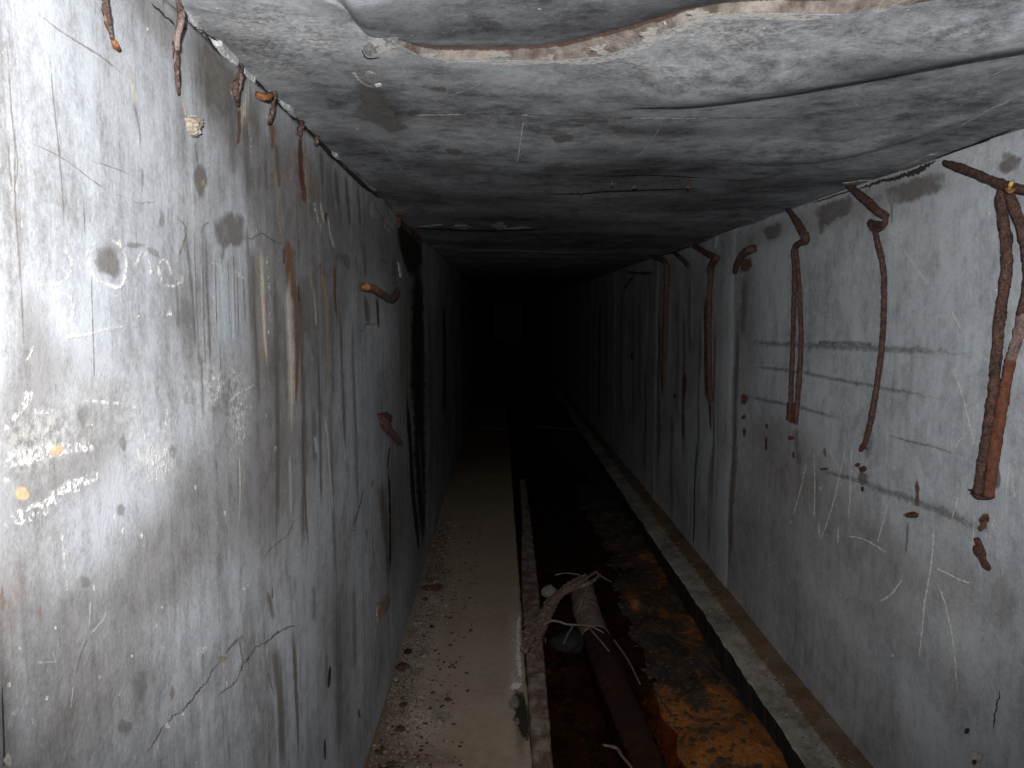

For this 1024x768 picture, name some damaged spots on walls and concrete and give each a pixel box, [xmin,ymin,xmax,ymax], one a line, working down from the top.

spalling [352,0,933,88]
corrosion [237,86,251,152]
spalling [151,0,546,302]
damp [97,249,118,275]
damp [216,213,248,251]
corrosion [265,112,337,439]
crack [144,629,287,755]